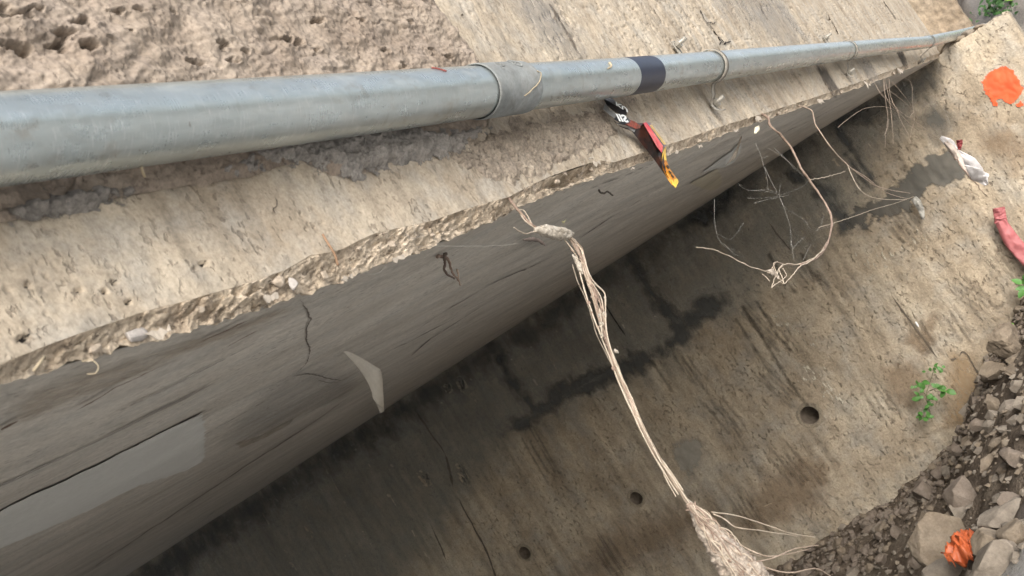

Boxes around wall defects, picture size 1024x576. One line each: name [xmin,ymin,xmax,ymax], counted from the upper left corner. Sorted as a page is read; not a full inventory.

spalling [0,53,940,384]
crack [296,300,341,383]
peeling [343,351,384,413]
water stain [459,253,727,435]